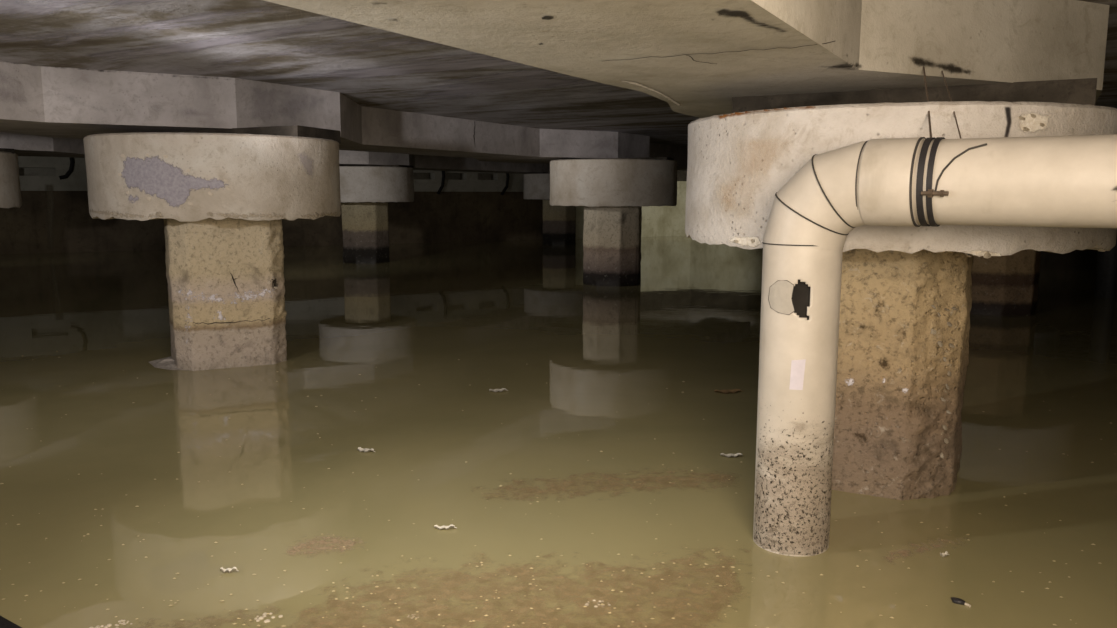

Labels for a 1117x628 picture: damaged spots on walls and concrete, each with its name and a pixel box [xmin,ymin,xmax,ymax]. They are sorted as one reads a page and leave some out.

peeling [90,153,231,218]